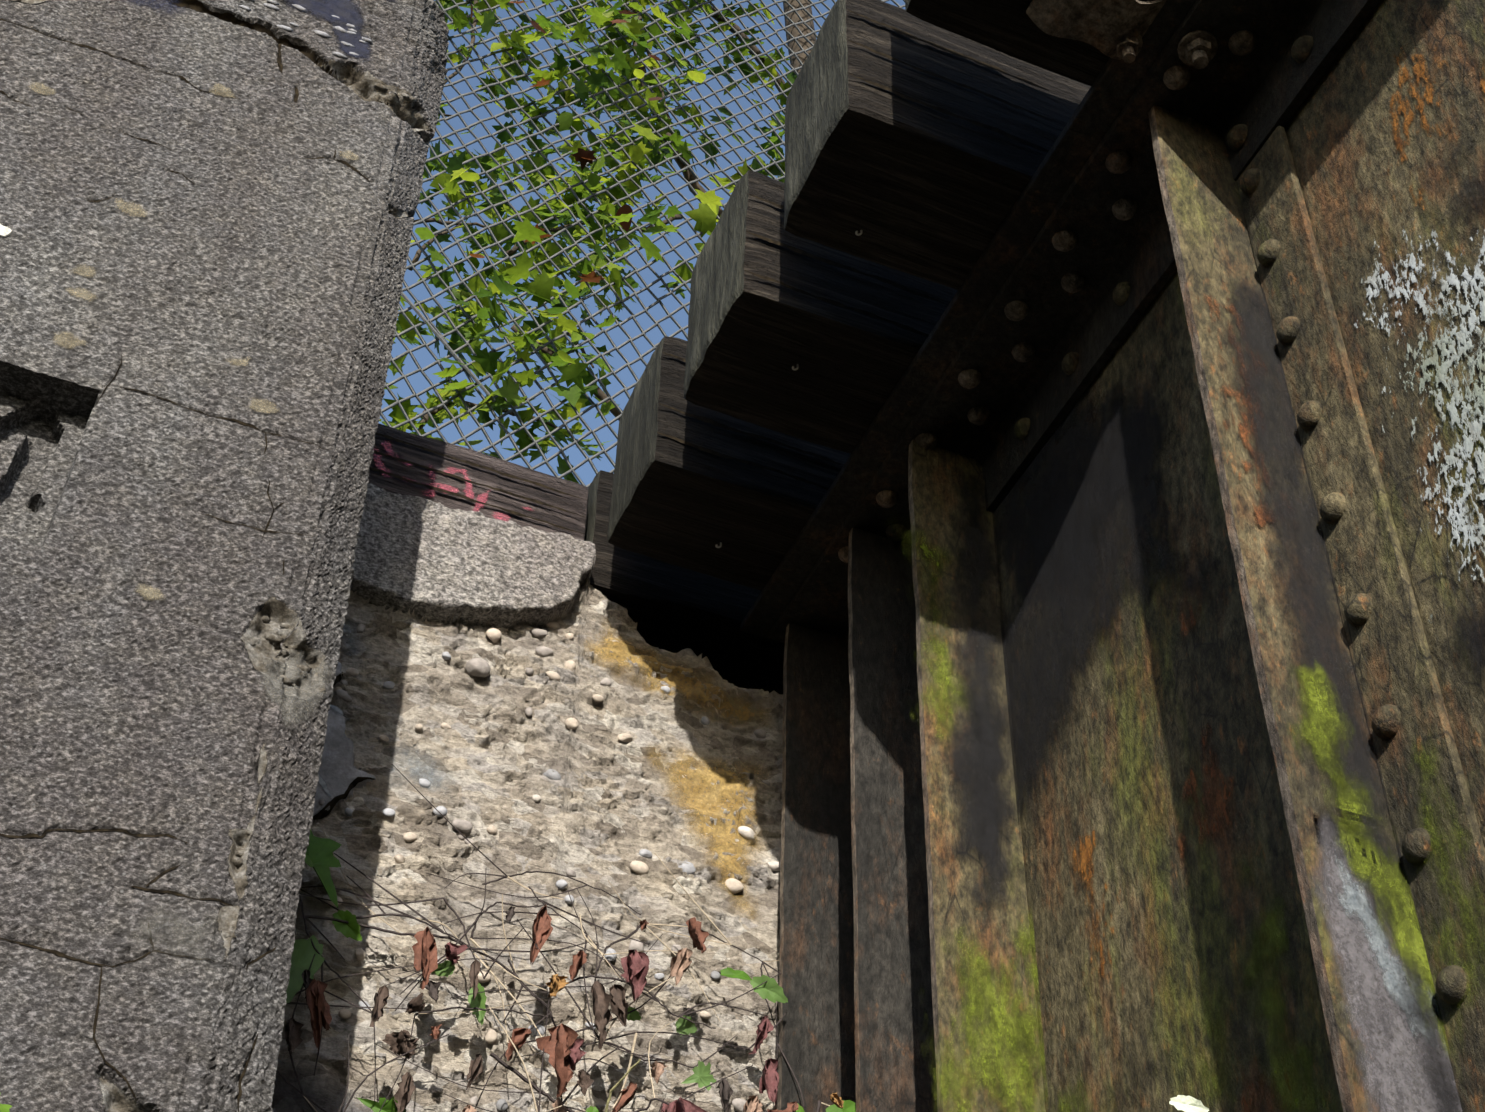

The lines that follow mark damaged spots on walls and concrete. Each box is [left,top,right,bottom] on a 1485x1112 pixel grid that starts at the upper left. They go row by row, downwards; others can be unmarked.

crack [0,19,226,97]
crack [167,0,336,103]
spalling [239,0,430,132]
corrosion [1388,43,1452,170]
peeling [1354,229,1485,582]
leakage [951,371,1216,899]
leakage [1233,282,1462,1112]
leakage [1454,608,1485,671]
spalling [216,743,268,958]
spalling [241,573,783,1112]
crack [0,828,277,1100]
crack [237,1034,258,1112]